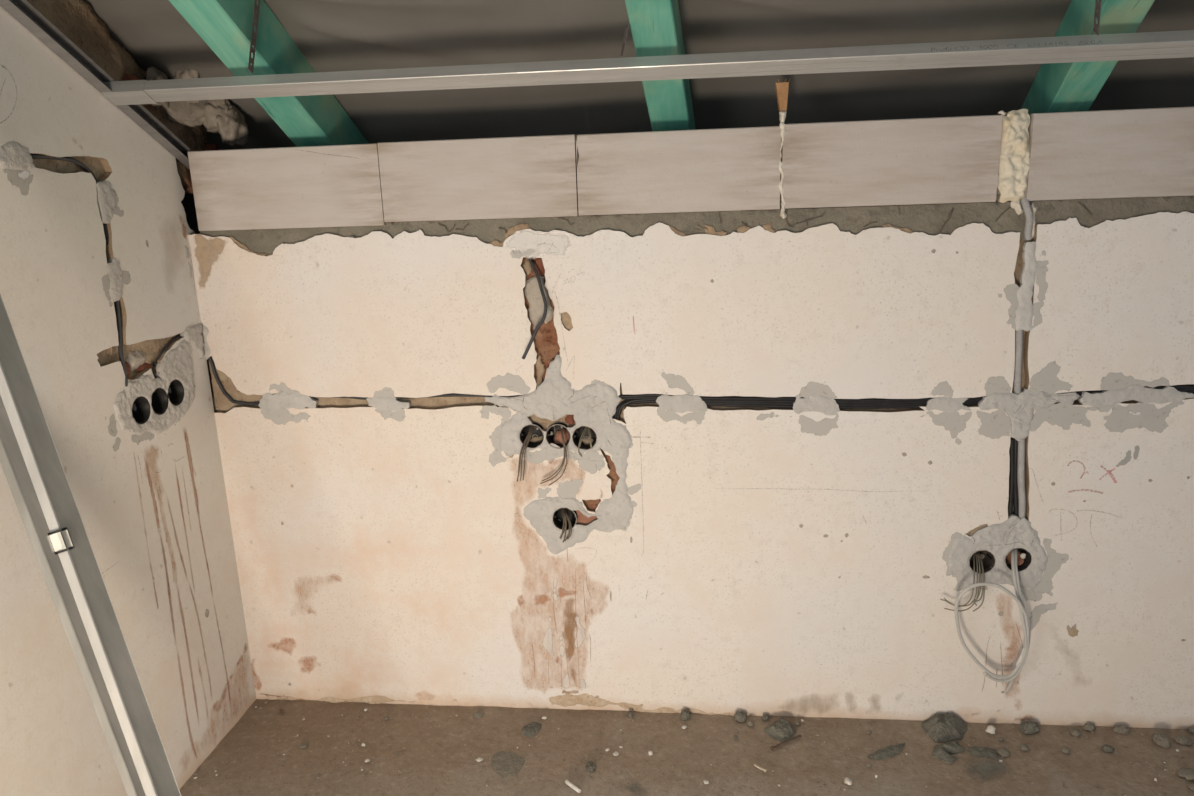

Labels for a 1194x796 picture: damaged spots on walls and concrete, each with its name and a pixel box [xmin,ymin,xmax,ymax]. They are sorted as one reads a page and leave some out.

peeling [195,235,225,286]
peeling [507,231,569,258]